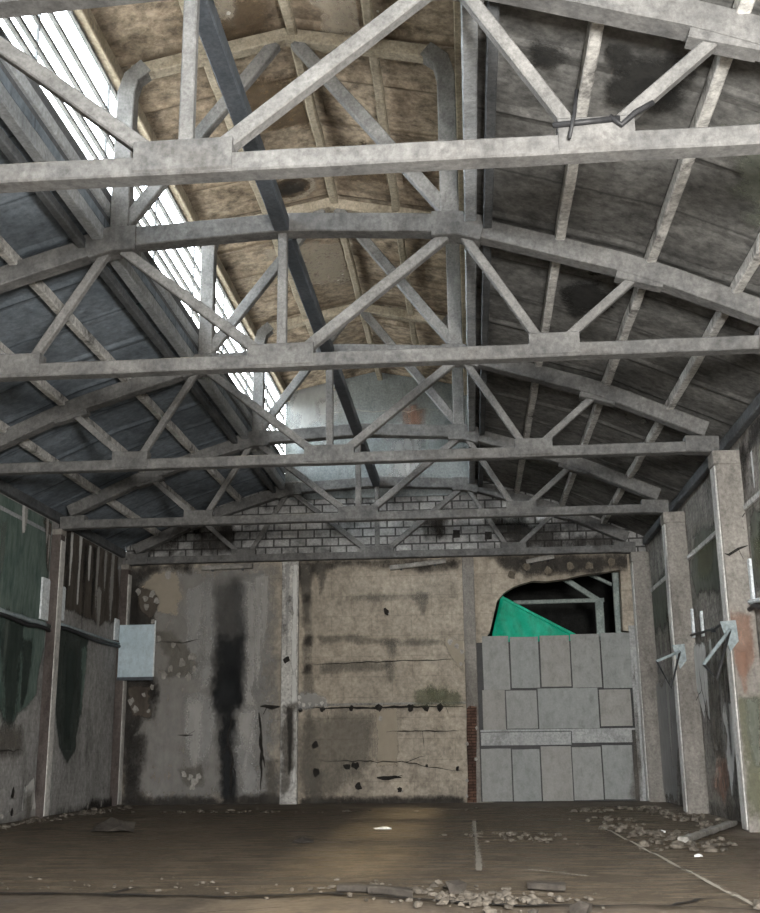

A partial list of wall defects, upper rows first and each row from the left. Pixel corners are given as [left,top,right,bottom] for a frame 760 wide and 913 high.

flaking render [135,571,182,624]
peeling [128,632,197,718]
water stain [122,559,463,805]
corrosion [730,614,754,691]
peeling [10,778,36,817]
spalling [83,798,112,810]